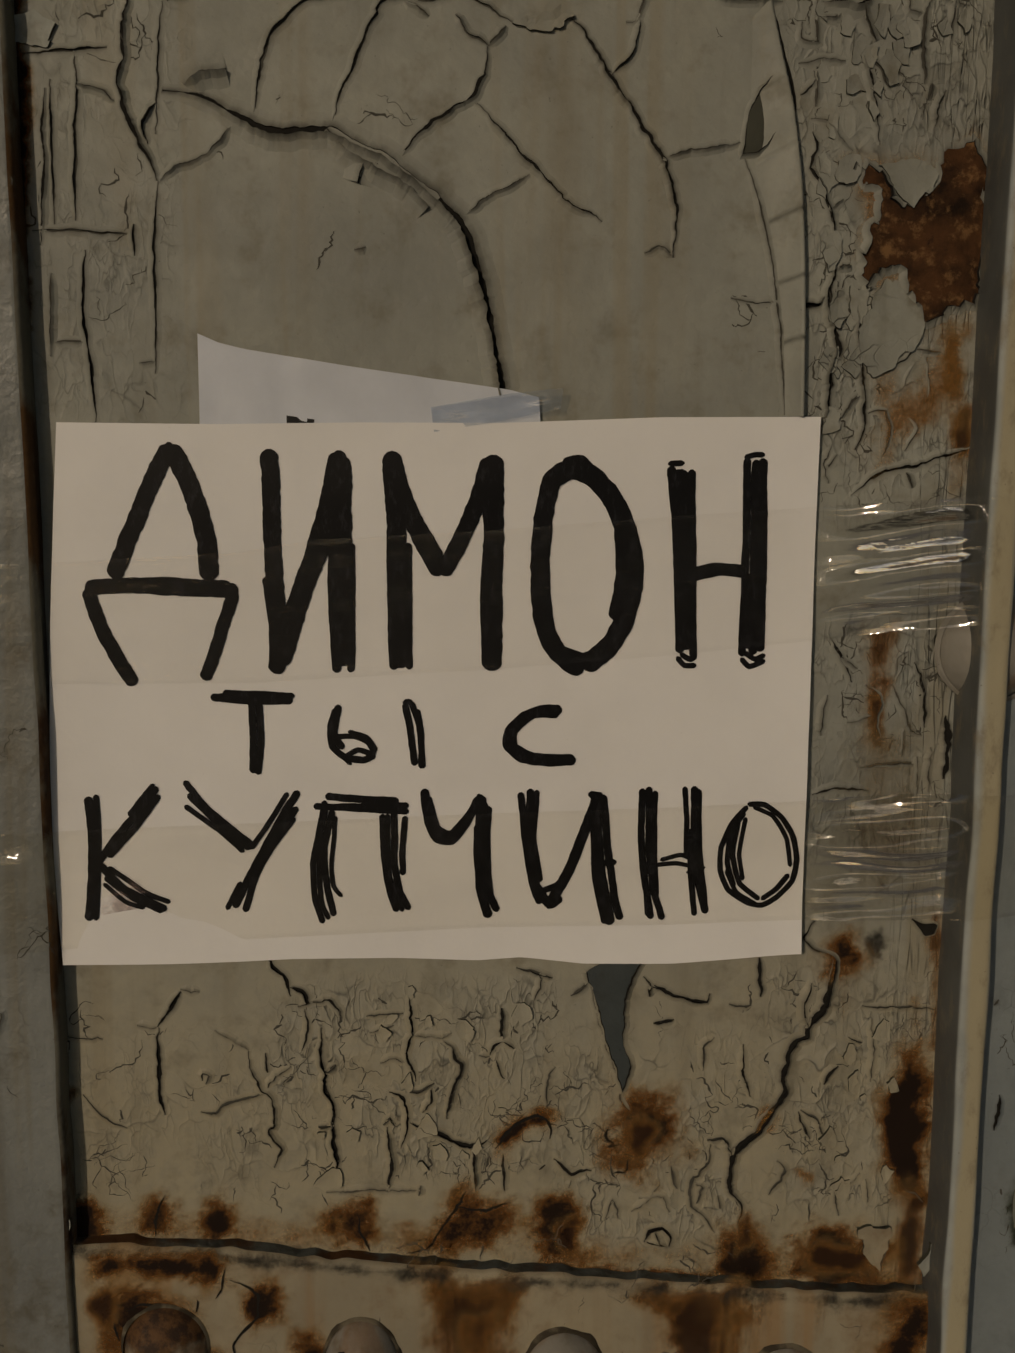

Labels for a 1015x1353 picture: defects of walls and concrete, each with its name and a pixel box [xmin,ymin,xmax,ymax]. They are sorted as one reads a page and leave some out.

peeling [738,75,776,159]
crack [11,0,604,423]
crack [567,0,990,507]
rust [853,133,987,456]
crack [17,926,55,959]
peeling [581,964,646,1094]
rust [86,1195,237,1353]
rust [286,1197,379,1249]
crack [68,918,939,1312]
rust [402,1184,633,1353]
rust [600,1090,677,1180]
rust [633,1034,936,1353]